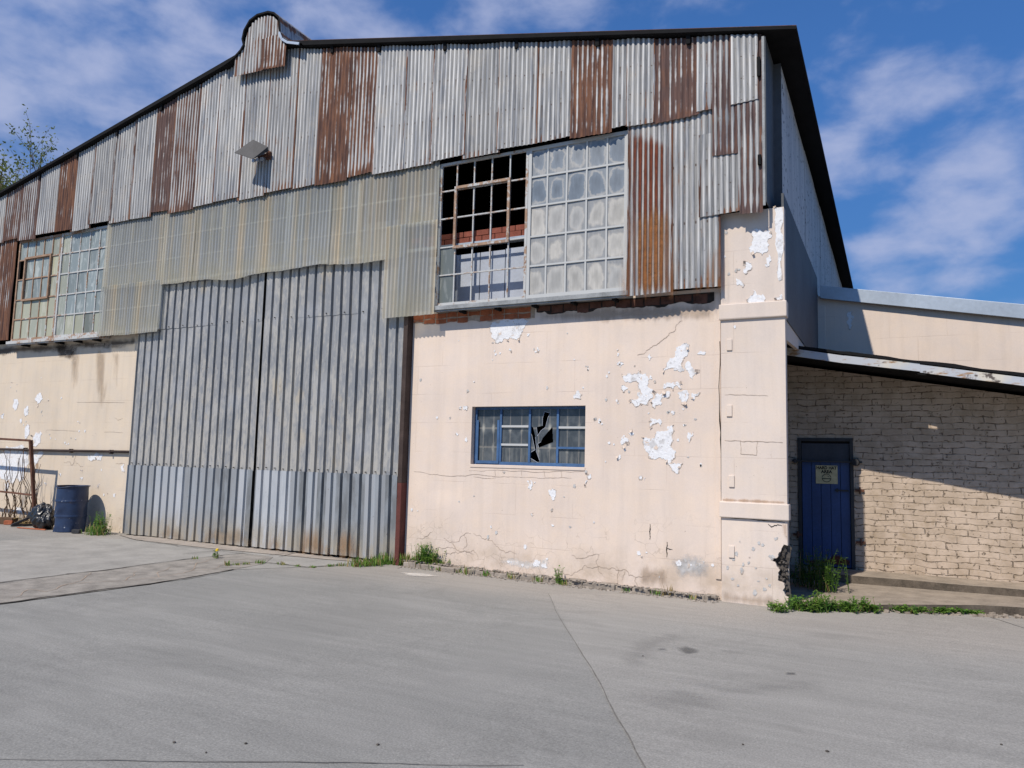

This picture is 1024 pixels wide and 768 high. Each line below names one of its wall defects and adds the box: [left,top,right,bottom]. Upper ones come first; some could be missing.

corrosion [632,135,667,291]
peeling [727,205,784,303]
flaking render [413,292,714,361]
peeling [0,382,86,490]
peeling [605,342,706,474]
crack [420,532,512,557]
crack [561,528,672,585]
spalling [675,537,792,598]